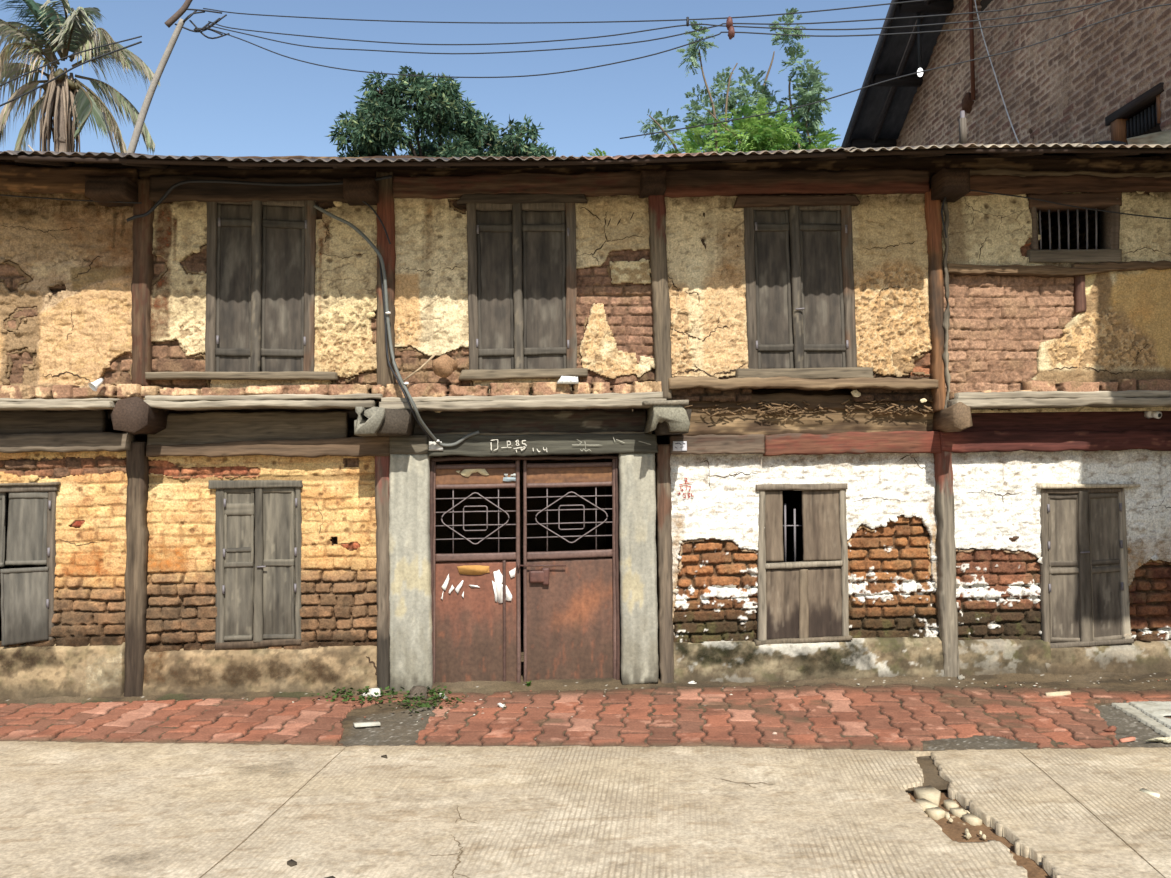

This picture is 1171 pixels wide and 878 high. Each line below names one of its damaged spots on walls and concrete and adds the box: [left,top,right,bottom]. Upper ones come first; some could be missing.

flaking render [571,245,656,390]
flaking render [943,275,1076,391]
flaking render [0,455,126,482]
flaking render [673,538,758,643]
flaking render [847,511,939,638]
flaking render [956,537,1043,640]
flaking render [1123,555,1171,642]
leakage [0,633,119,668]
leakage [145,639,194,673]
leakage [206,665,291,684]
leakage [306,662,334,682]
leakage [311,637,377,648]